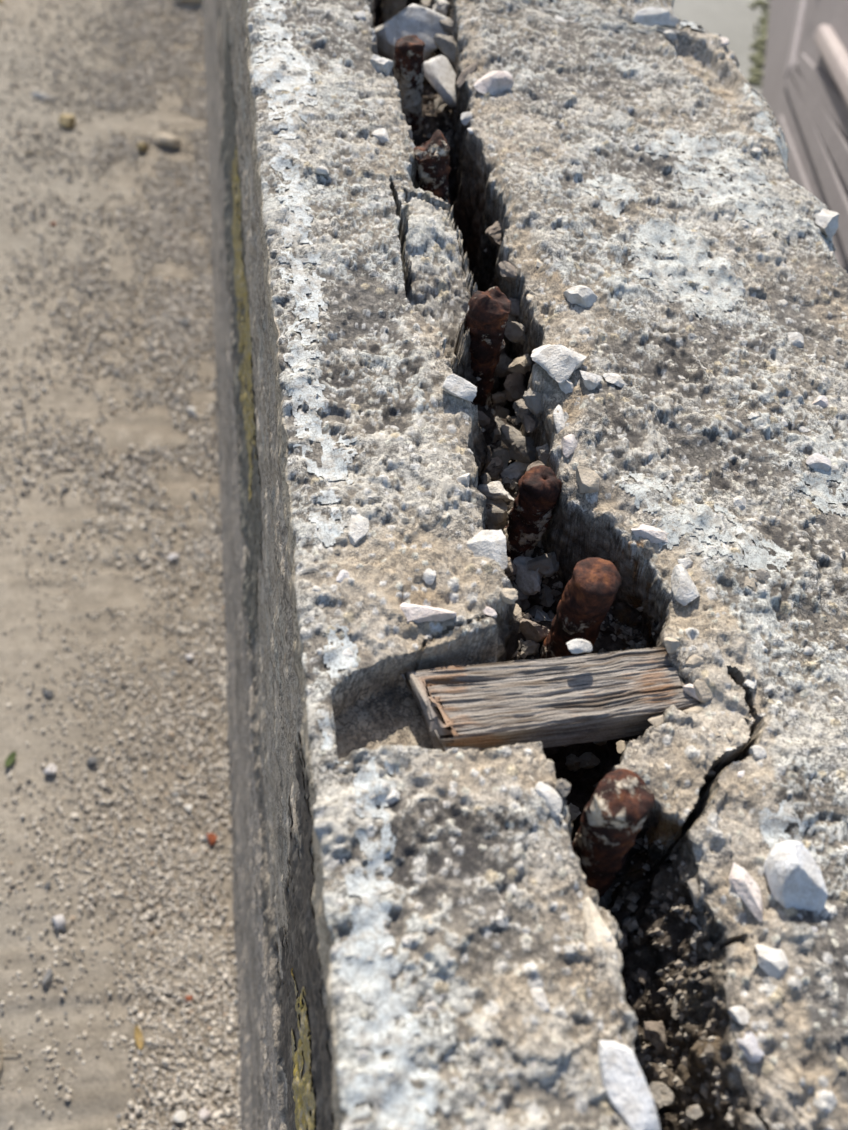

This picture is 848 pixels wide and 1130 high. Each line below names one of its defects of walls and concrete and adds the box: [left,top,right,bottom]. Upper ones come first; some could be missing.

peeling [584,171,640,218]
peeling [641,128,775,225]
peeling [219,17,262,657]
spalling [251,0,498,679]
spalling [465,286,511,408]
crack [371,0,687,682]
spalling [503,465,562,561]
spalling [539,557,621,659]
crack [542,711,665,848]
peeling [273,709,556,1130]
crack [601,665,771,1130]